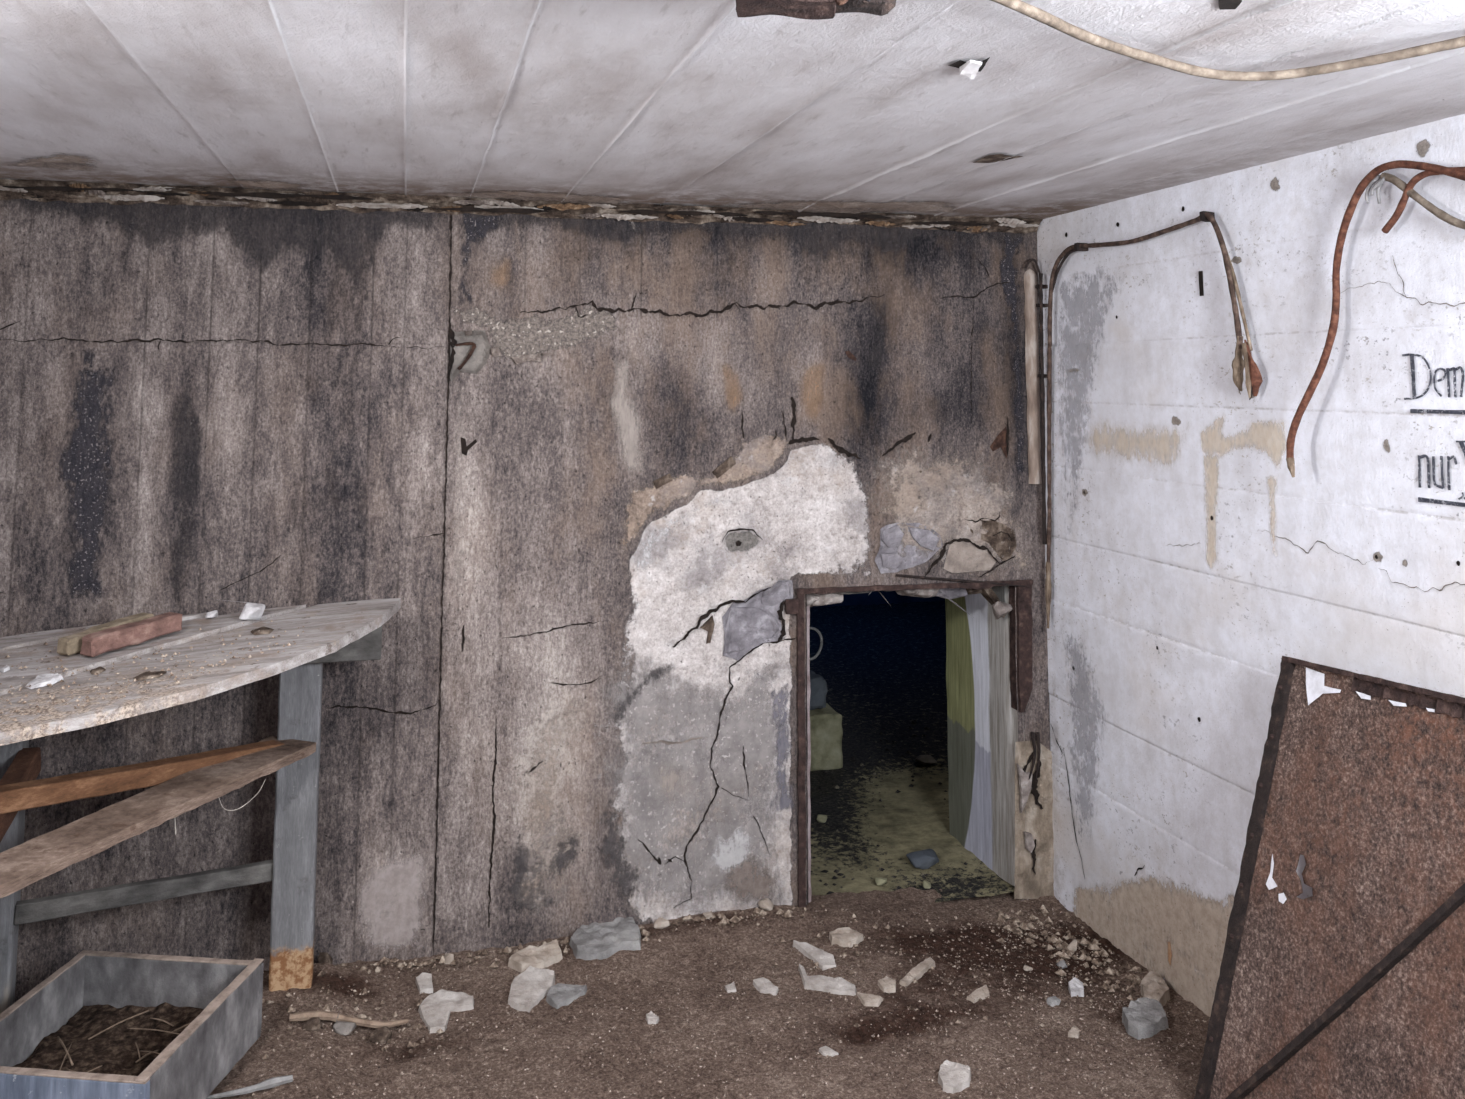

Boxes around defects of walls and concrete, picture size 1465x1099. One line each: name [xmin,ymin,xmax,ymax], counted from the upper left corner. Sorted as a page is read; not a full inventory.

crack [520,293,884,318]
crack [1341,259,1465,307]
damp [1093,427,1180,464]
damp [1201,418,1286,568]
peeling [599,417,1029,923]
crack [638,637,797,908]
damp [1074,877,1234,1017]